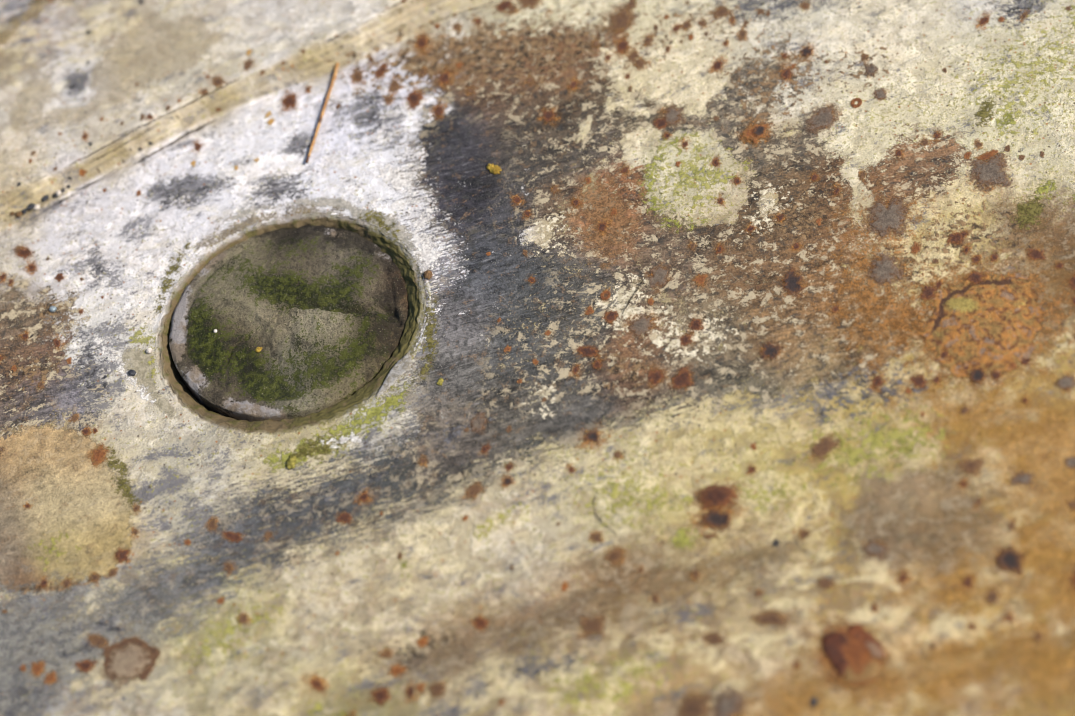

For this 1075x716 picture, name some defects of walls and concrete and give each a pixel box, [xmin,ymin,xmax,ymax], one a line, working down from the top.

rust [976,12,1005,29]
rust [327,0,898,133]
rust [653,117,688,149]
rust [815,183,1075,394]
rust [584,288,618,323]
rust [679,317,703,346]
rust [572,345,602,378]
rust [645,367,694,393]
rust [836,458,993,585]
rust [986,589,999,605]
rust [75,634,161,681]